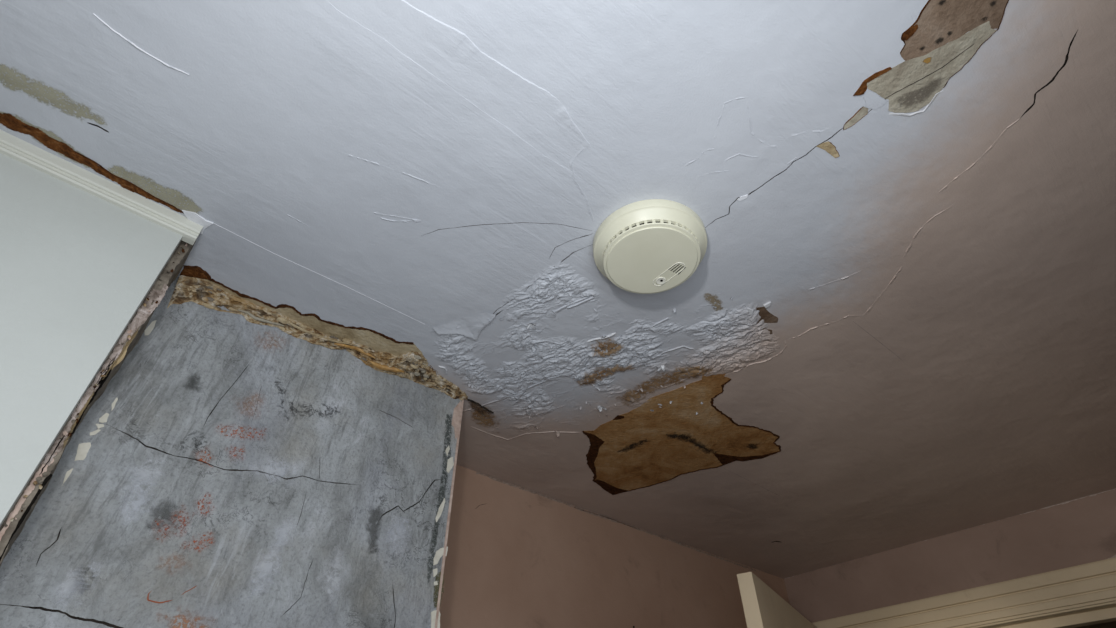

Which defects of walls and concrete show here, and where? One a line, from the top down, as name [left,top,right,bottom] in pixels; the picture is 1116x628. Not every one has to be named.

water stain [0,65,105,124]
peeling [843,0,1009,130]
crack [1021,30,1078,117]
crack [705,128,843,228]
crack [204,367,262,425]
peeling [0,240,781,566]
crack [107,424,355,530]
crack [380,479,444,519]
crack [0,604,123,628]